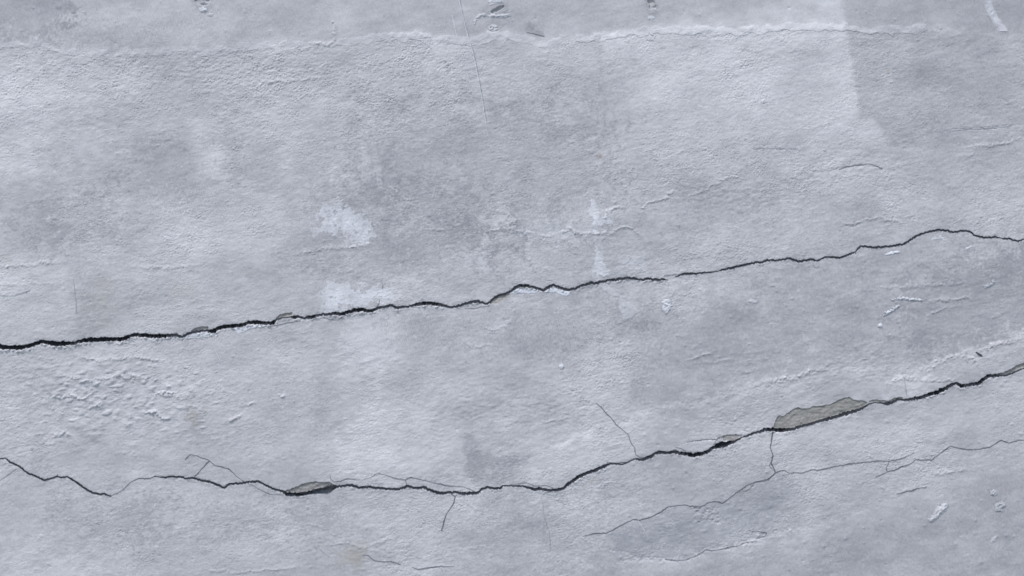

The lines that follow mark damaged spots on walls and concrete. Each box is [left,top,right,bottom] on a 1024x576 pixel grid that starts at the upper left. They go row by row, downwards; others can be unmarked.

crack [0,229,1024,351]
crack [0,368,1024,551]
spalling [773,397,903,428]
crack [665,530,767,561]